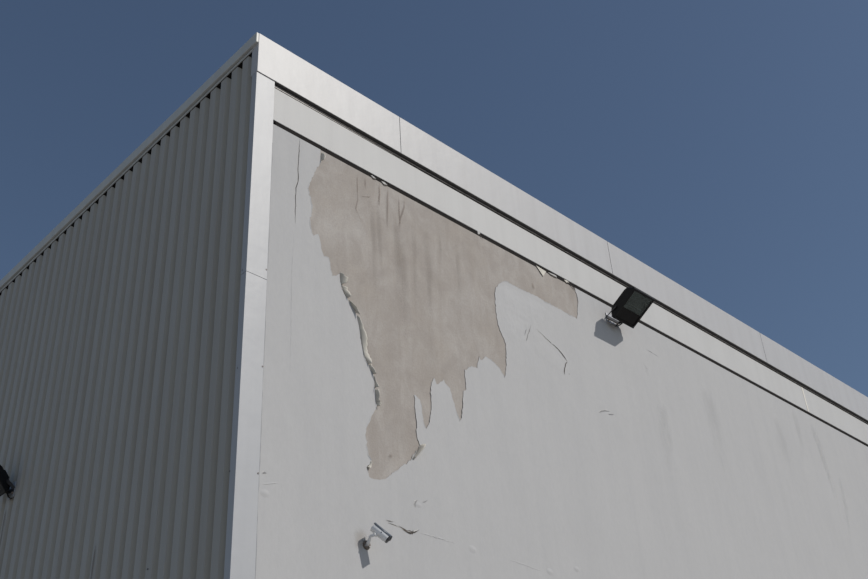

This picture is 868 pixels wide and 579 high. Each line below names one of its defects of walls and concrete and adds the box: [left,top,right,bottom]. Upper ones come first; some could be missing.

crack [293,142,301,223]
peeling [307,149,579,480]
crack [525,326,567,374]
crack [387,520,417,534]